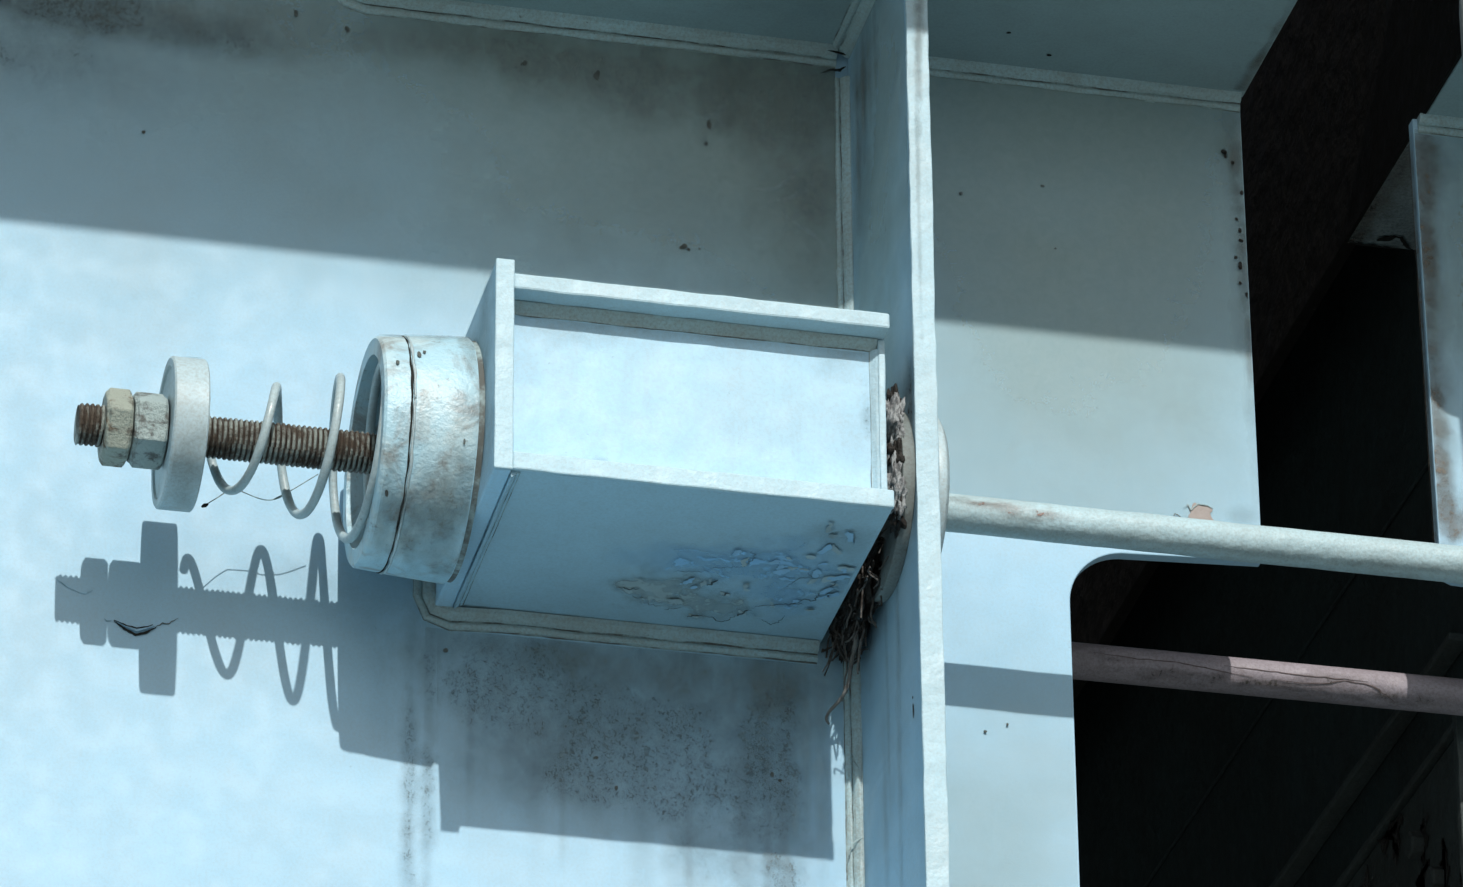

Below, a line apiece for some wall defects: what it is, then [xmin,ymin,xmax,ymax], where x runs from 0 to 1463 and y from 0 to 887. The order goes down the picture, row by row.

corrosion [1412,144,1436,358]
peeling [1174,503,1213,520]
corrosion [1423,377,1462,537]
crack [54,577,178,636]
leakage [446,648,800,835]